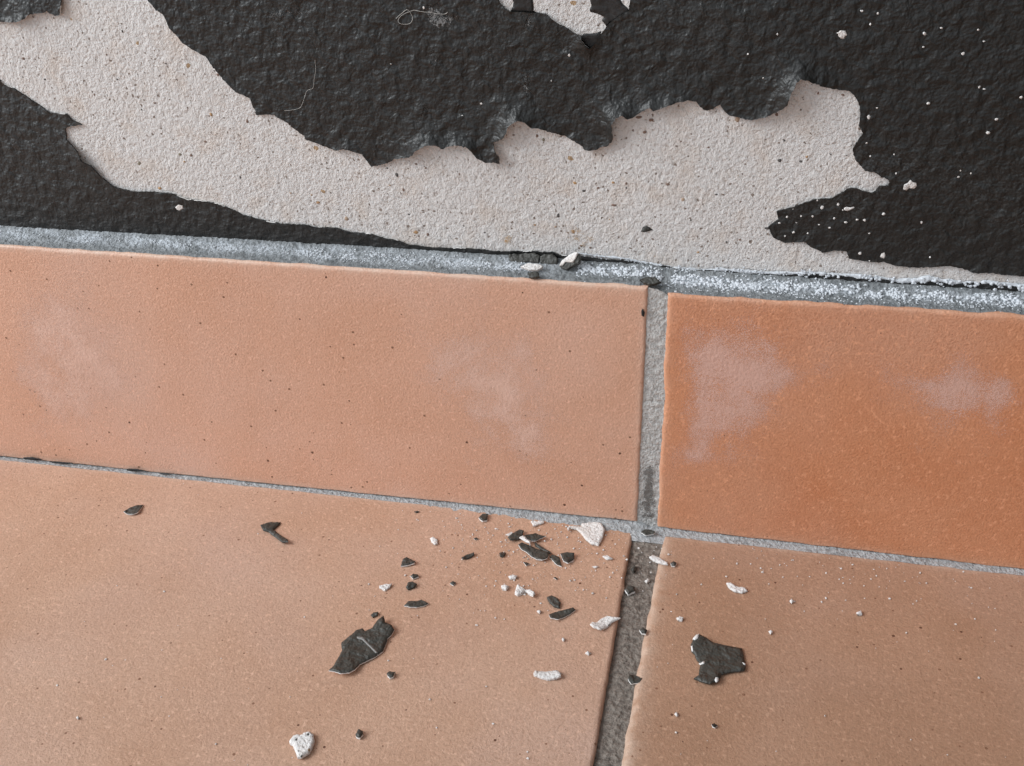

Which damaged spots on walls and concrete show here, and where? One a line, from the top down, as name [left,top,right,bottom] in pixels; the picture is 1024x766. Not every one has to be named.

peeling [0,0,1024,284]
leakage [388,297,586,489]
leakage [576,252,1024,476]